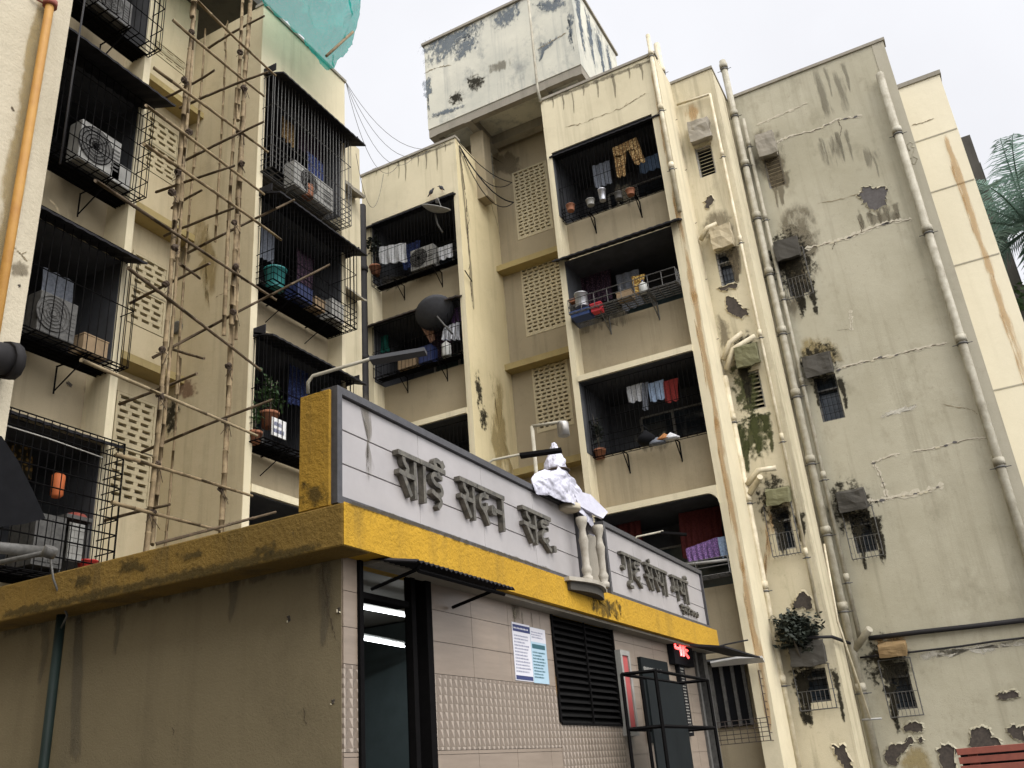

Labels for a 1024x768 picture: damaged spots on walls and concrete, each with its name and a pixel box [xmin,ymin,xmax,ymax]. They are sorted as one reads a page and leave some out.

crack [777,114,862,144]
spalling [856,184,889,213]
crack [805,192,912,251]
spalling [717,281,750,321]
water stain [792,280,818,317]
crack [836,342,947,371]
water stain [739,367,752,403]
water stain [737,412,774,472]
crack [867,404,986,503]
spalling [995,688,1021,702]
spalling [830,742,855,768]
spalling [883,720,1024,768]